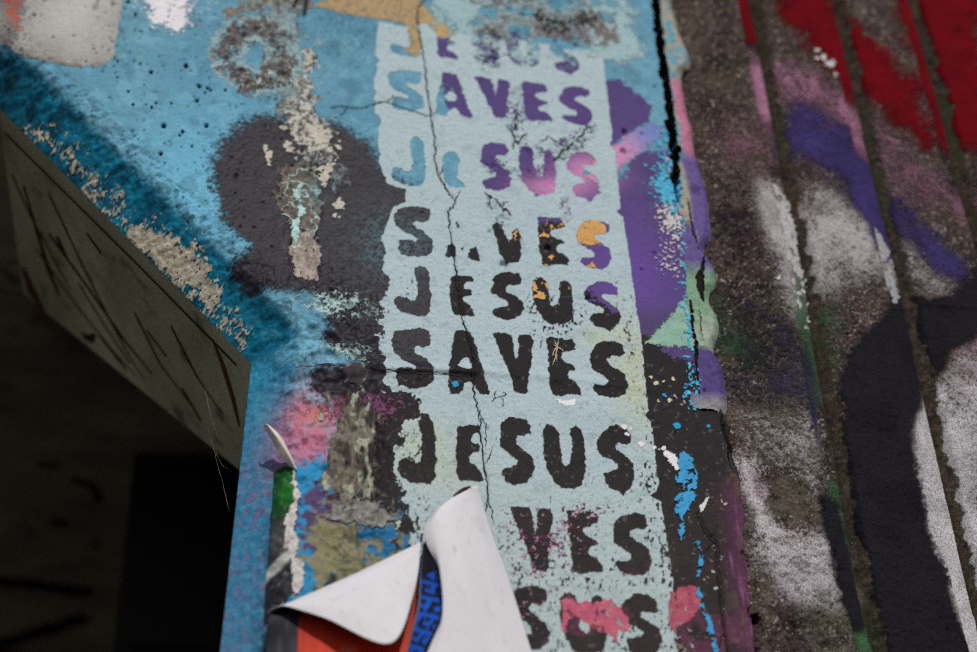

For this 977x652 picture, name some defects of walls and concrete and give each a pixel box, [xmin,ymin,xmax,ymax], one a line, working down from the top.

peeling [24,123,254,352]
peeling [263,119,345,281]
crack [296,0,511,522]
crack [651,0,705,381]